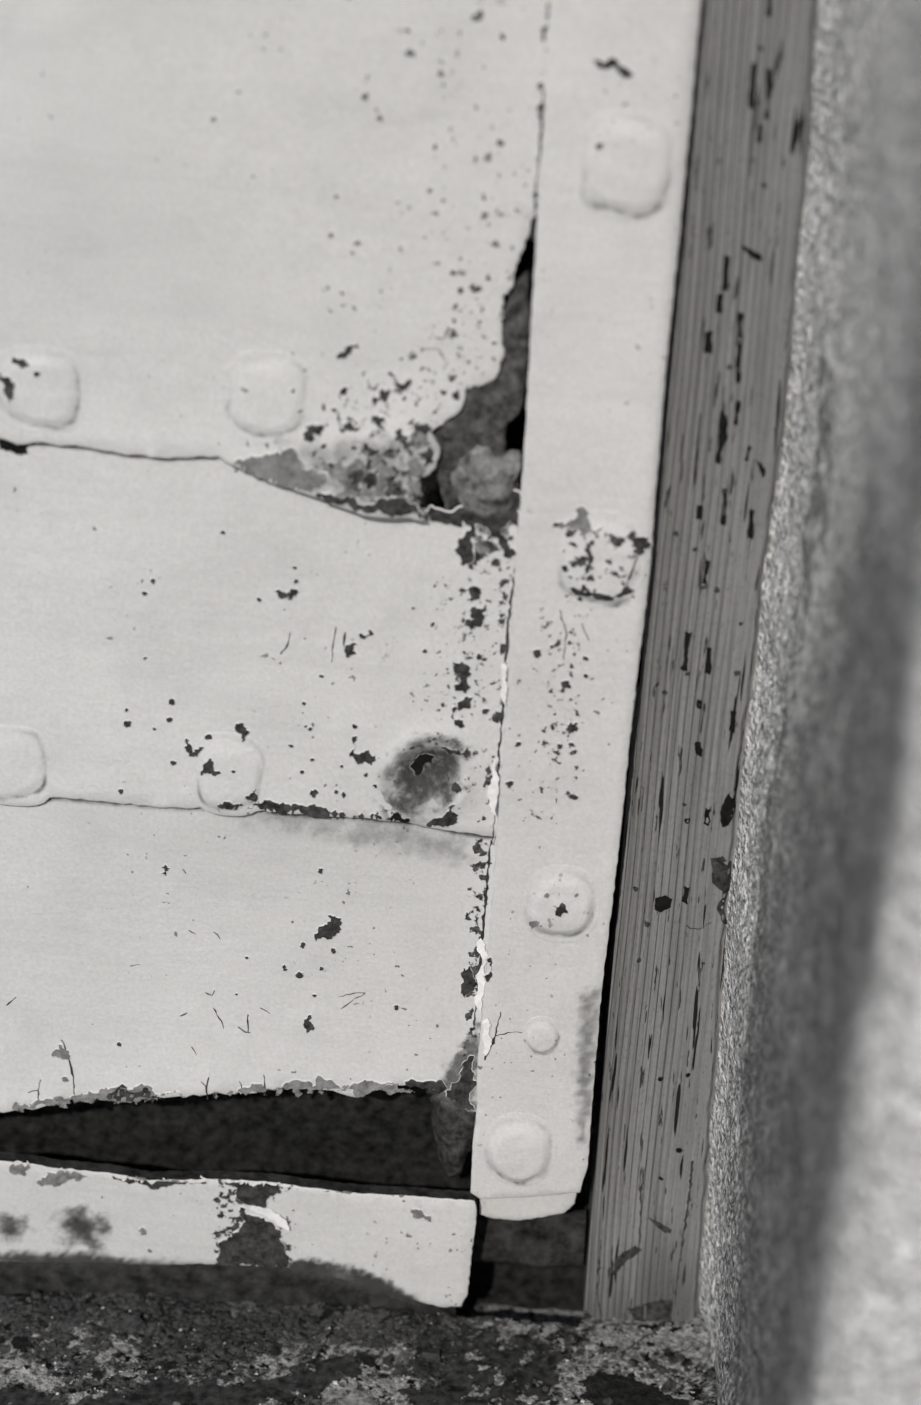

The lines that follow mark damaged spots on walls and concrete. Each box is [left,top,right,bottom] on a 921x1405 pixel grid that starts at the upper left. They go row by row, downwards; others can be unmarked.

peeling [470,8,485,23]
peeling [335,343,361,360]
peeling [234,377,436,519]
rust [523,504,653,821]
rust [303,269,531,1179]
rust [217,798,378,820]
rust [53,1094,145,1108]
peeling [27,1082,184,1110]
rust [266,1085,349,1097]
peeling [227,1074,447,1098]
peeling [8,1161,88,1187]
peeling [111,1174,291,1269]